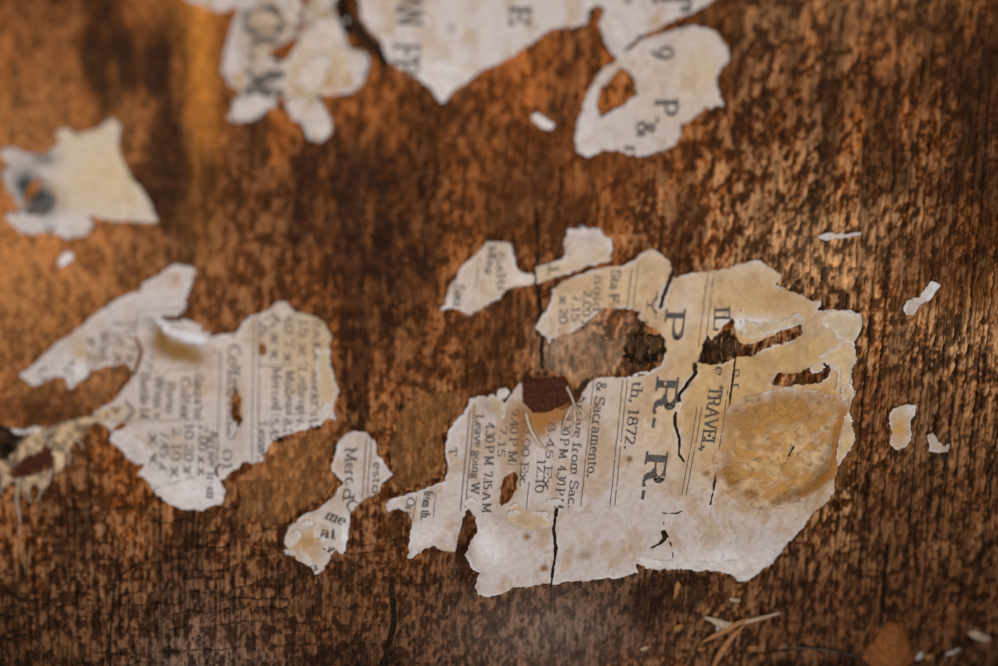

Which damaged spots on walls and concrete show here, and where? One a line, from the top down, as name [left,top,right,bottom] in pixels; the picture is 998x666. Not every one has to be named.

peeling [228,0,348,123]
peeling [532,112,555,130]
peeling [6,213,46,235]
peeling [573,225,609,249]
peeling [164,319,210,345]
peeling [497,388,509,399]
leakage [725,398,847,503]
peeling [284,520,341,566]
crack [549,508,558,588]
crack [878,544,890,625]
crack [751,644,862,660]
crack [912,632,998,665]